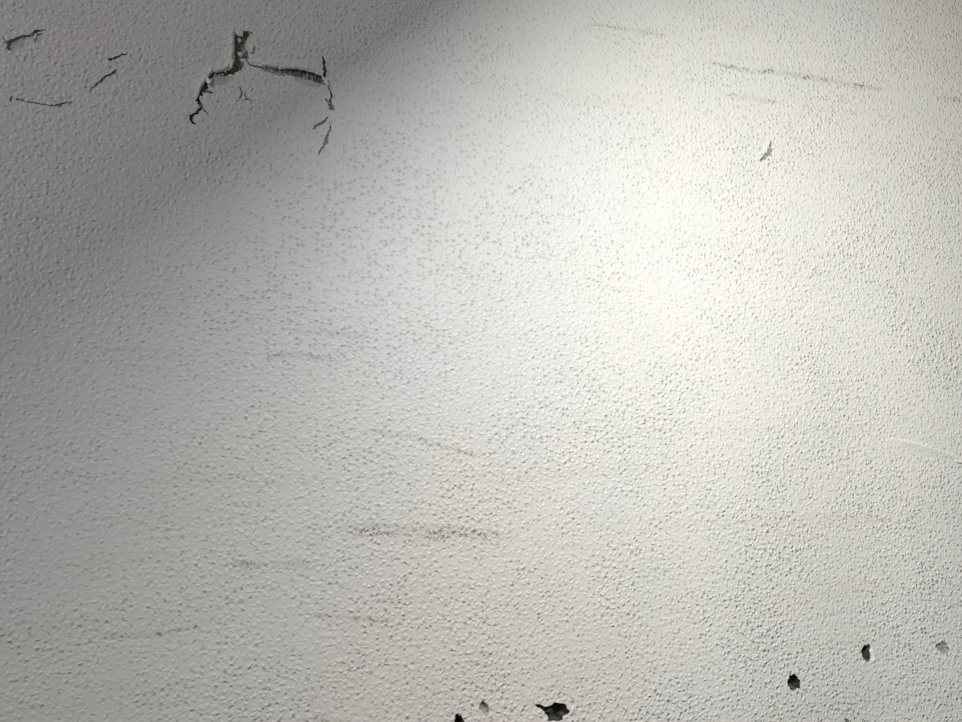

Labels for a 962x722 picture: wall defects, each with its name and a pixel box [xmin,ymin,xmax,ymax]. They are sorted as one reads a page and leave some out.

crack [10,53,127,107]
crack [189,24,334,156]
flaking render [535,702,575,722]